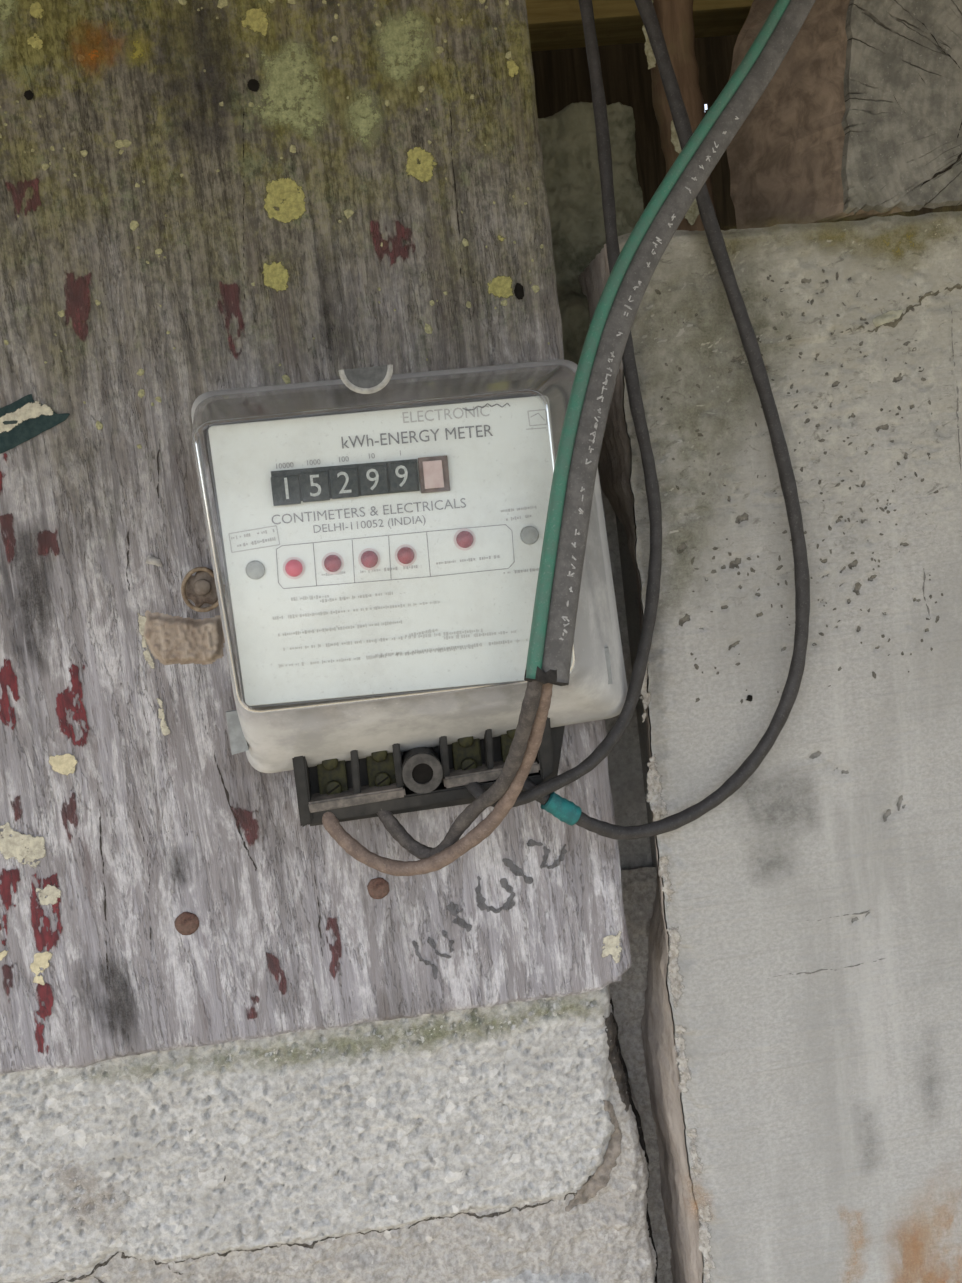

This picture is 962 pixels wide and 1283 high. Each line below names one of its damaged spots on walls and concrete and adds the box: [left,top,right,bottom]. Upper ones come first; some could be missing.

damp [171,4,230,142]
peeling [0,513,16,563]
peeling [33,530,60,556]
peeling [0,659,19,730]
peeling [56,664,89,747]
peeling [11,796,23,821]
peeling [61,792,78,842]
peeling [0,868,63,952]
peeling [2,965,13,1002]
peeling [34,983,54,1053]
crack [51,1174,594,1283]